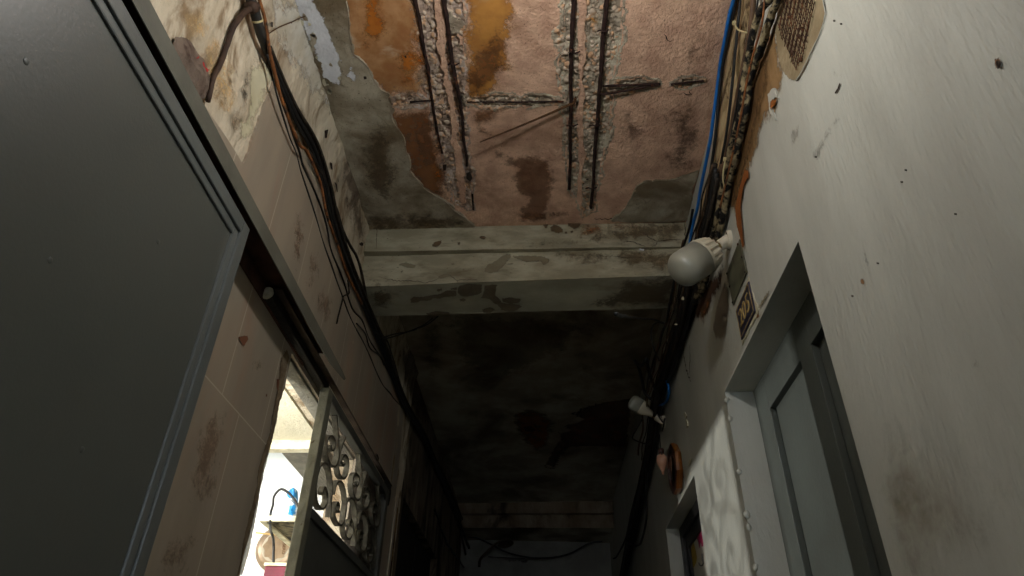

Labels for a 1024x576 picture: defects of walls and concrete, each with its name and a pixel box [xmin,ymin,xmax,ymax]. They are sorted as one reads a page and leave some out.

corrosion [347,0,424,94]
corrosion [463,0,514,97]
leakage [344,132,463,239]
corrosion [393,108,448,198]
peeling [295,0,707,239]
leakage [495,152,566,222]
peeling [768,88,779,120]